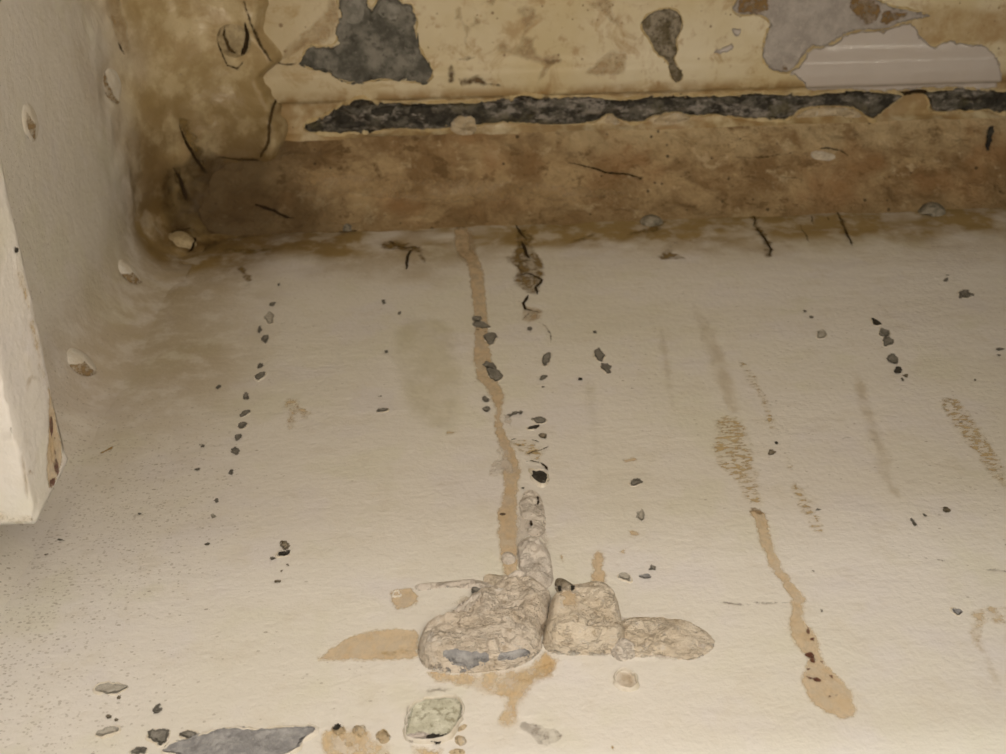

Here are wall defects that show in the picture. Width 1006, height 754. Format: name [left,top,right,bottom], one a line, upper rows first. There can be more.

crack [217,1,295,69]
peeling [299,0,434,85]
spalling [640,7,684,83]
peeling [732,0,1002,92]
crack [901,88,927,96]
crack [173,99,277,201]
crack [171,227,196,252]
crack [255,204,293,218]
leakage [320,228,715,673]
leakage [715,416,855,718]
peeling [129,723,319,754]
spalling [403,694,467,754]